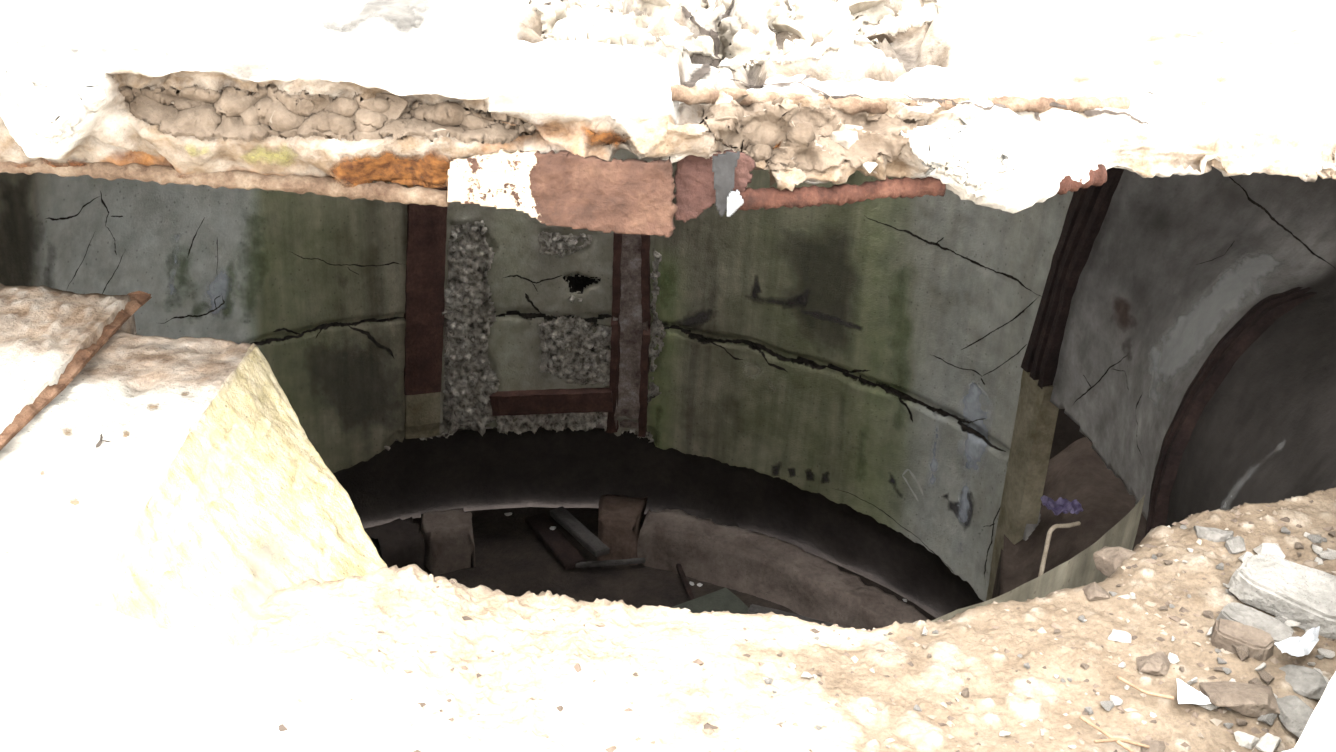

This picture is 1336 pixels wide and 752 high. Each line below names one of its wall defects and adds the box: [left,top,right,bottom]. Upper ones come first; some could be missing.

spalling [527,0,979,77]
spalling [119,68,536,146]
rust [329,151,454,188]
spalling [697,94,927,186]
crack [46,191,124,294]
crack [1229,176,1335,268]
damp [209,268,234,314]
crack [250,317,404,358]
spalling [420,220,654,443]
damp [750,236,862,344]
crack [865,216,1042,385]
crack [664,325,1008,464]